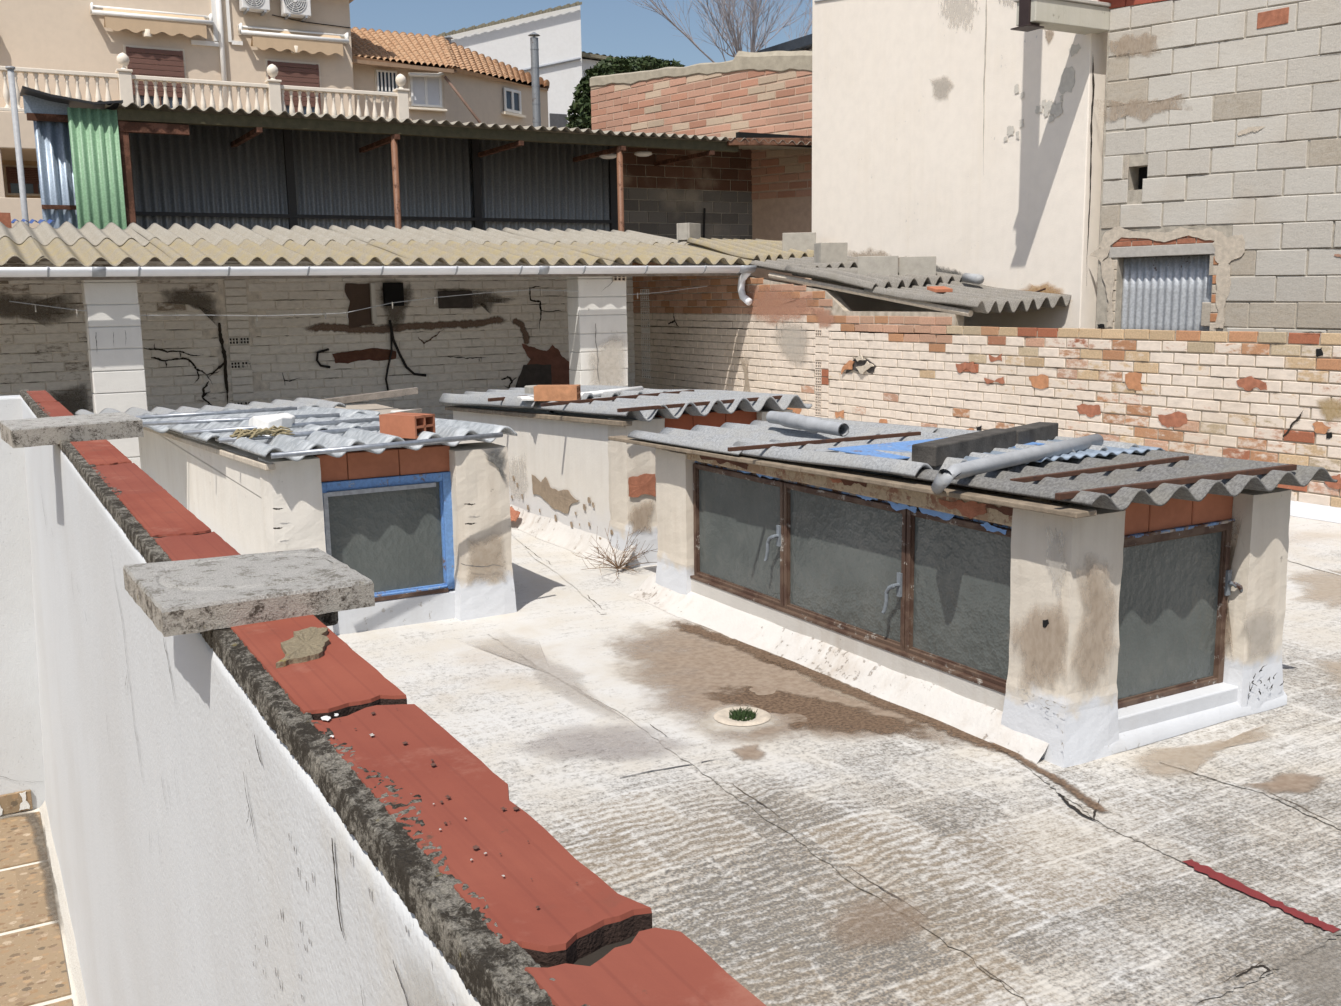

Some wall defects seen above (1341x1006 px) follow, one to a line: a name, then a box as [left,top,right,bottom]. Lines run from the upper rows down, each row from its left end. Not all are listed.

crack [95,323,228,406]
spalling [515,344,570,388]
damp [486,452,505,480]
flaking render [510,475,613,540]
damp [469,538,503,581]
damp [1013,565,1114,684]
damp [623,623,1108,812]
crack [1058,793,1102,824]